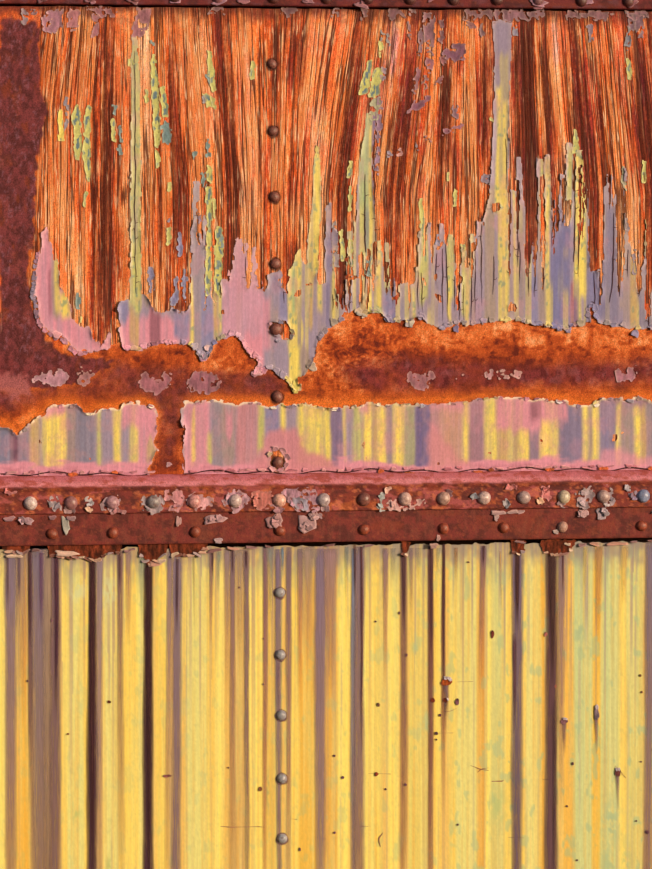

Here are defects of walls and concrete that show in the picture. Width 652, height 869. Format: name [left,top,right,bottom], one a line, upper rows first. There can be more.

corrosion [0,6,48,342]
peeling [0,0,652,475]
peeling [141,487,329,534]
peeling [376,487,426,512]
peeling [491,484,525,521]
peeling [537,485,616,520]
peeling [2,495,271,567]
peeling [401,541,411,557]
peeling [511,539,526,555]
peeling [540,529,652,557]